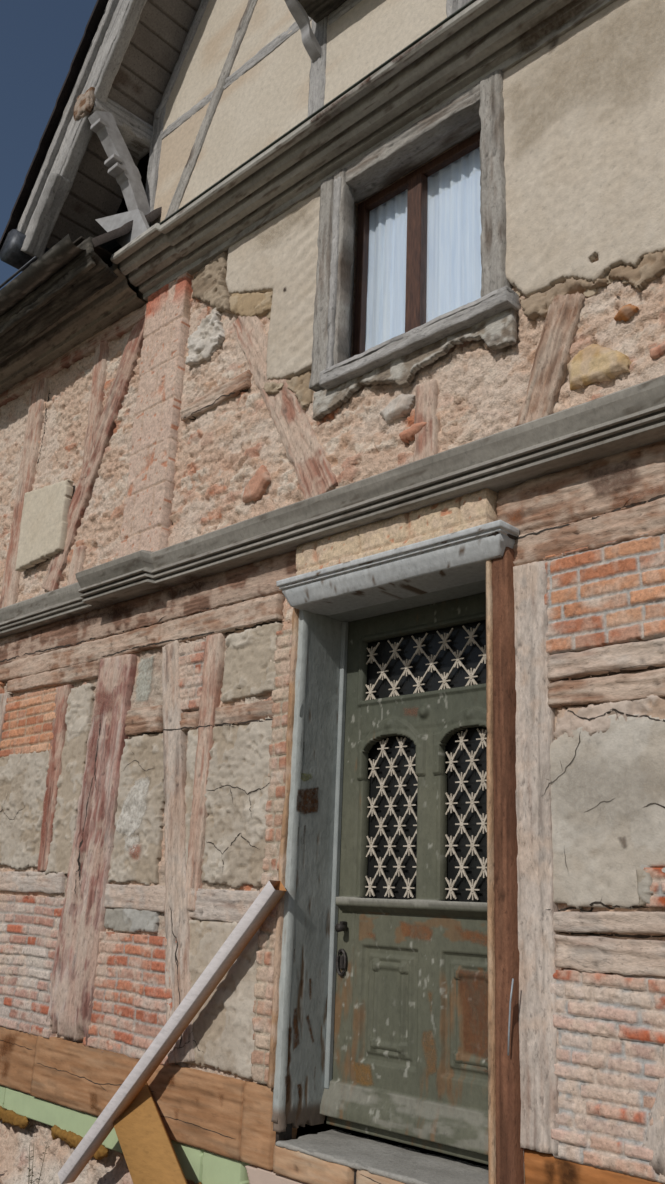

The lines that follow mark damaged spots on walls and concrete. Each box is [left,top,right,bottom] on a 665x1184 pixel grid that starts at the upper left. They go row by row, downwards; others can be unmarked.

flaking render [185,251,286,367]
flaking render [516,250,665,321]
flaking render [263,370,314,411]
crack [541,665,665,797]
peeling [297,773,318,833]
peeling [285,1009,314,1101]
leakage [547,1159,575,1184]